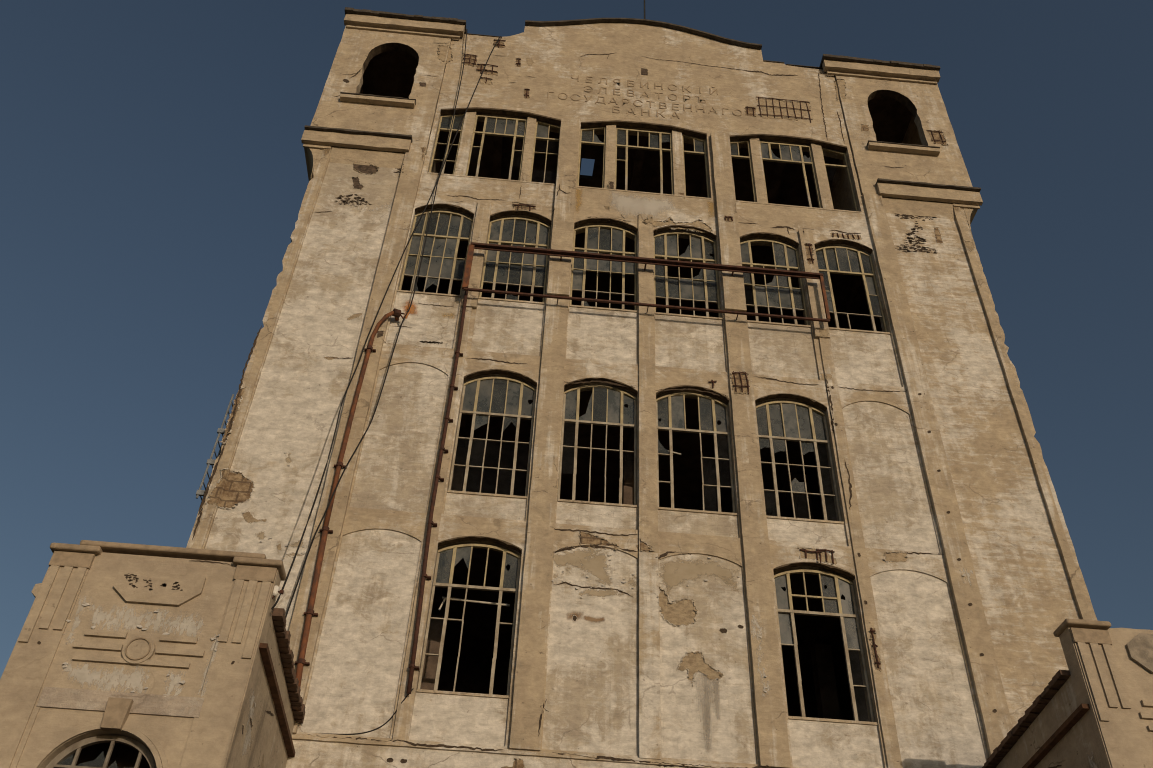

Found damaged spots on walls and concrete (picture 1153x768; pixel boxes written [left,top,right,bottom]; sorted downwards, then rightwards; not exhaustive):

spalling [335,162,393,211]
spalling [894,213,943,254]
spalling [206,468,306,557]
peeling [552,531,625,598]
peeling [657,557,740,627]
spalling [676,651,724,683]